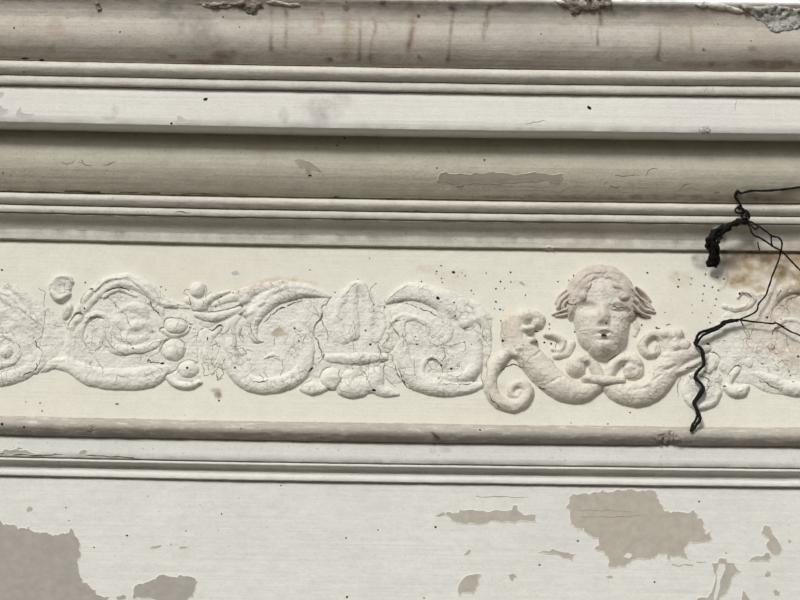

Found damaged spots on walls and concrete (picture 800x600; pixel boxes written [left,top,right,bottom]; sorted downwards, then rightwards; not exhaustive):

flaking render [199,0,300,14]
flaking render [555,0,612,15]
flaking render [694,1,800,33]
peeling [436,171,564,187]
crack [9,289,63,376]
crack [84,283,545,408]
peeling [0,519,198,600]
peeling [457,573,481,597]
peeling [435,504,537,526]
peeling [565,488,713,578]
peeling [696,557,742,600]
peeling [748,524,792,577]